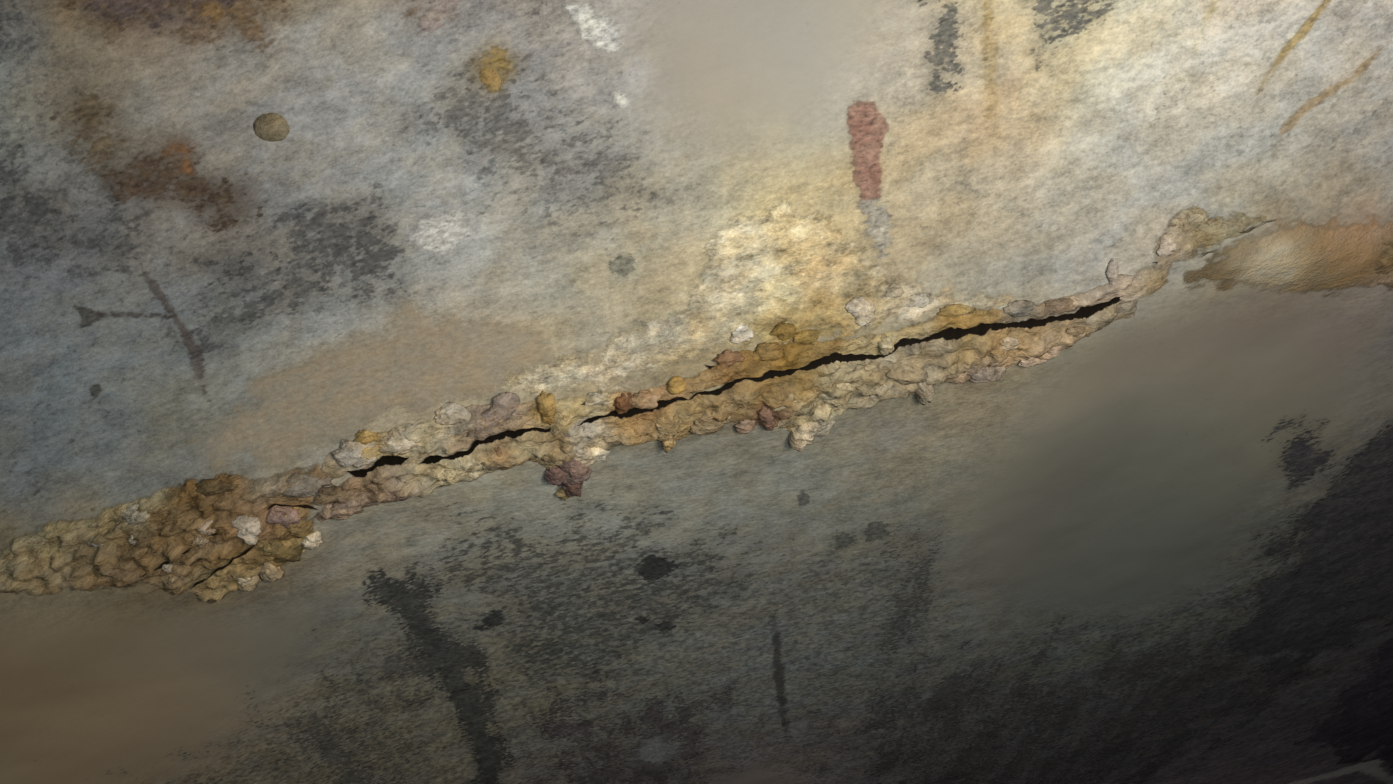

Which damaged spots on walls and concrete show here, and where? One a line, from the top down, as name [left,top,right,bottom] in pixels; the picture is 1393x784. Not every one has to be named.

rust [67,0,288,49]
water stain [918,0,964,94]
water stain [1031,0,1113,71]
rust [1259,0,1331,92]
rust [1283,50,1381,132]
rust [51,92,245,232]
rust [847,101,889,201]
spalling [0,207,1393,603]
crack [347,296,1123,477]
water stain [237,502,753,784]
water stain [807,419,1393,784]